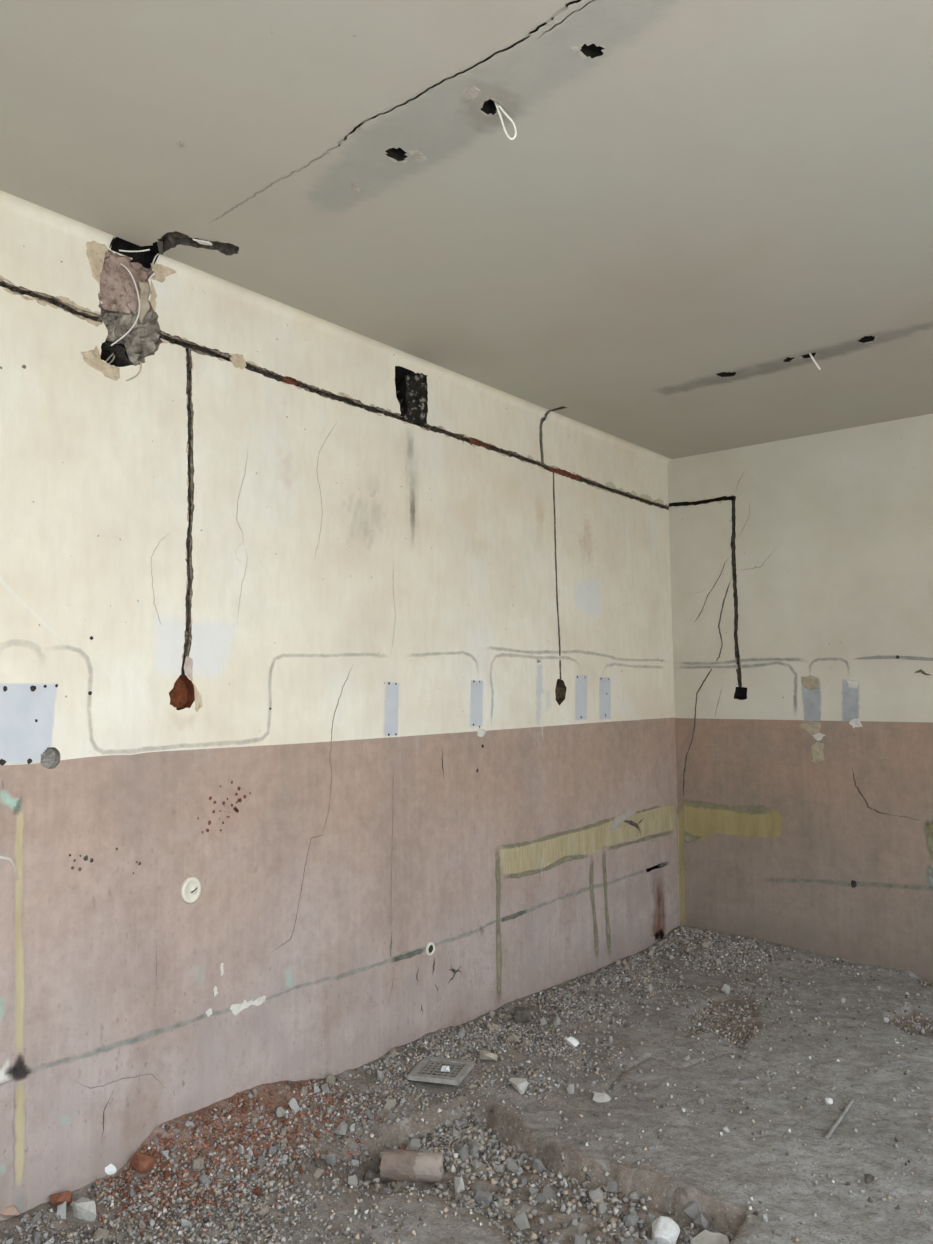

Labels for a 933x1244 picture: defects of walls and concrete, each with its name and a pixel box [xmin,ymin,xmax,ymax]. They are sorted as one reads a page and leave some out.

crack [208,0,593,224]
spalling [86,231,239,323]
spalling [80,345,120,381]
spalling [369,366,506,456]
crack [683,470,774,797]
crack [272,670,351,952]
crack [852,769,921,821]
peeling [230,996,266,1015]